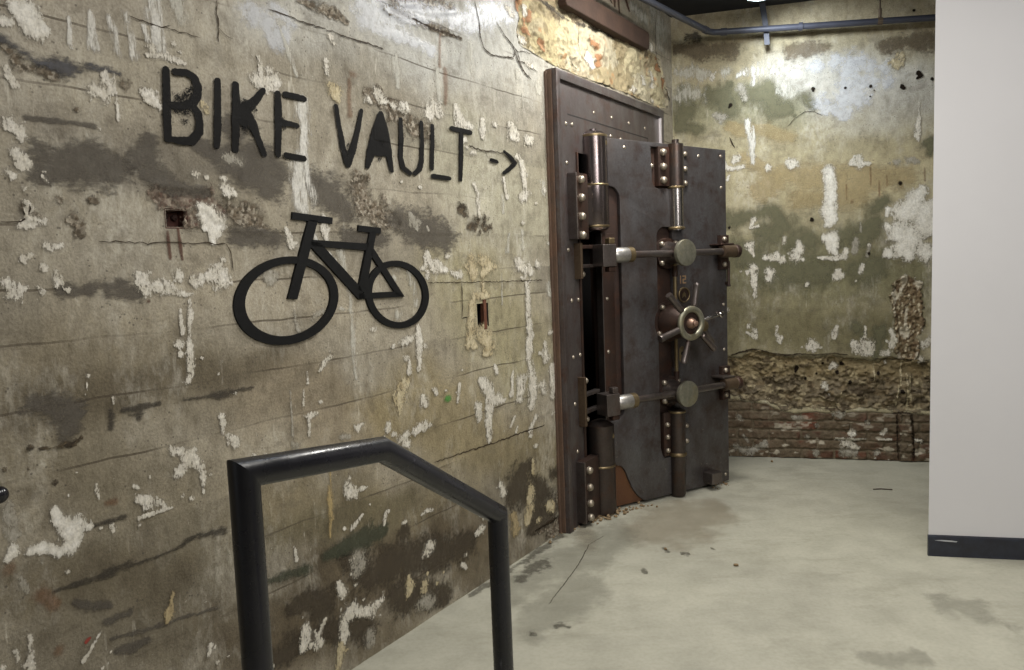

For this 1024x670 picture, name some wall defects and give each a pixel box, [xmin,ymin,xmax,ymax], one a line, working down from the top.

crack [269,9,383,49]
crack [412,3,536,79]
flaking render [504,0,669,110]
water stain [22,115,212,198]
corrosion [167,228,184,260]
peeling [817,163,871,282]
spalling [728,184,933,462]
peeling [419,249,560,540]
peeling [2,500,117,564]
water stain [505,459,559,537]
crack [550,536,603,603]